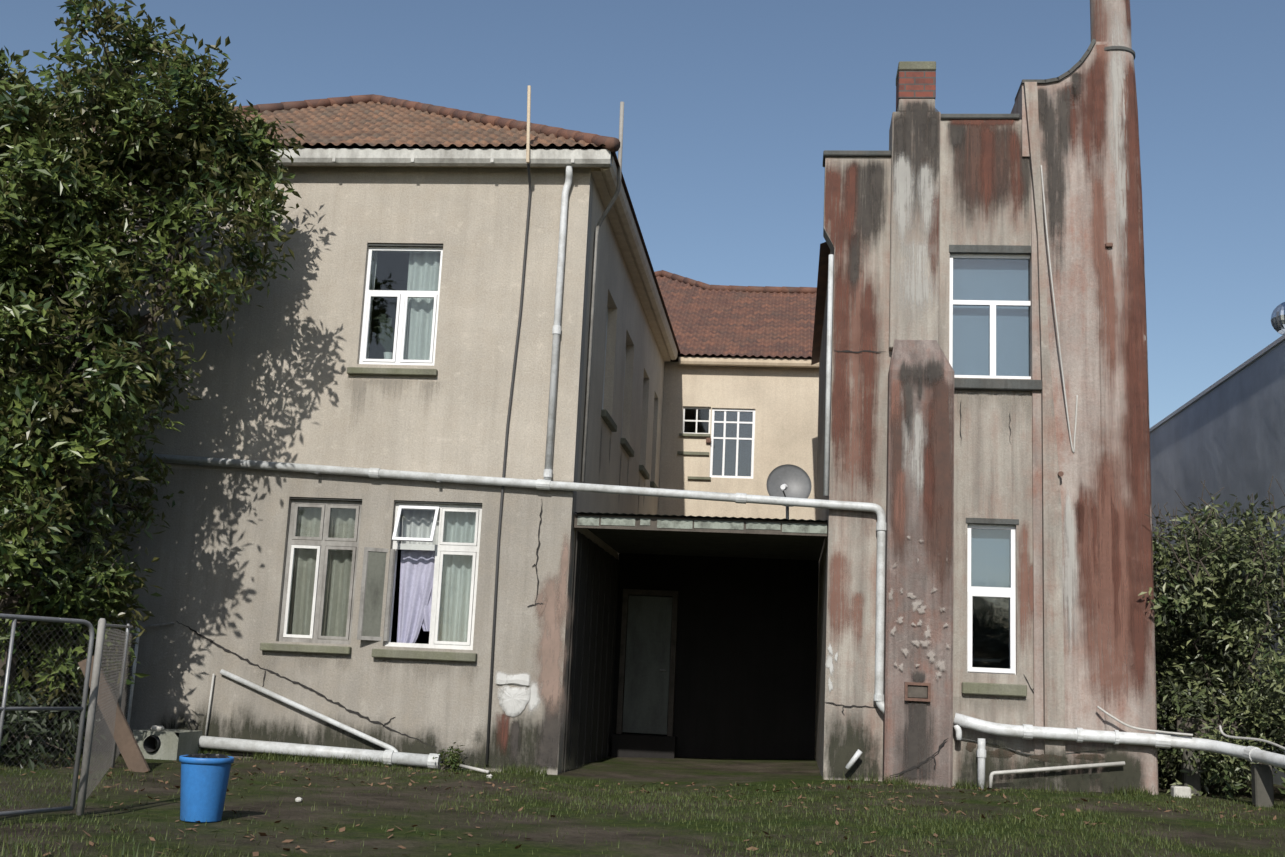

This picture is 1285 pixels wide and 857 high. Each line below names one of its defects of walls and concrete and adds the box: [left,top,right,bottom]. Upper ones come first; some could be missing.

water stain [843,101,1030,310]
corrosion [951,119,1023,215]
water stain [1038,73,1082,253]
corrosion [824,165,905,555]
corrosion [1064,0,1155,698]
crack [527,498,543,607]
spalling [889,588,950,679]
corrosion [924,381,954,595]
water stain [160,696,563,769]